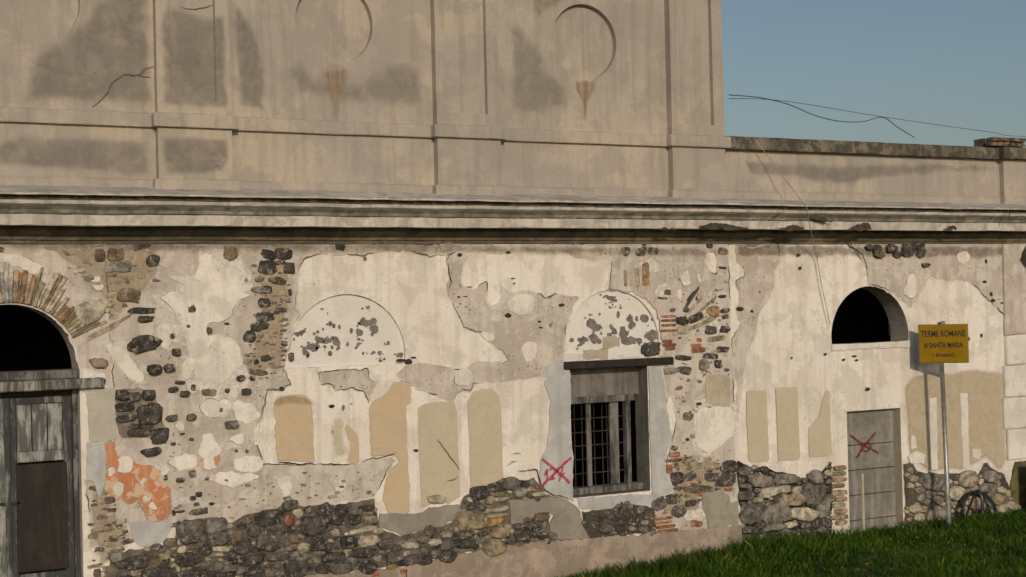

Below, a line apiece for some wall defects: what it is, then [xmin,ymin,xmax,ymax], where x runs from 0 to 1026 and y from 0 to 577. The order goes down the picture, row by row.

crack [92,66,154,107]
spalling [700,223,748,231]
peeling [849,244,1004,315]
peeling [0,243,781,577]